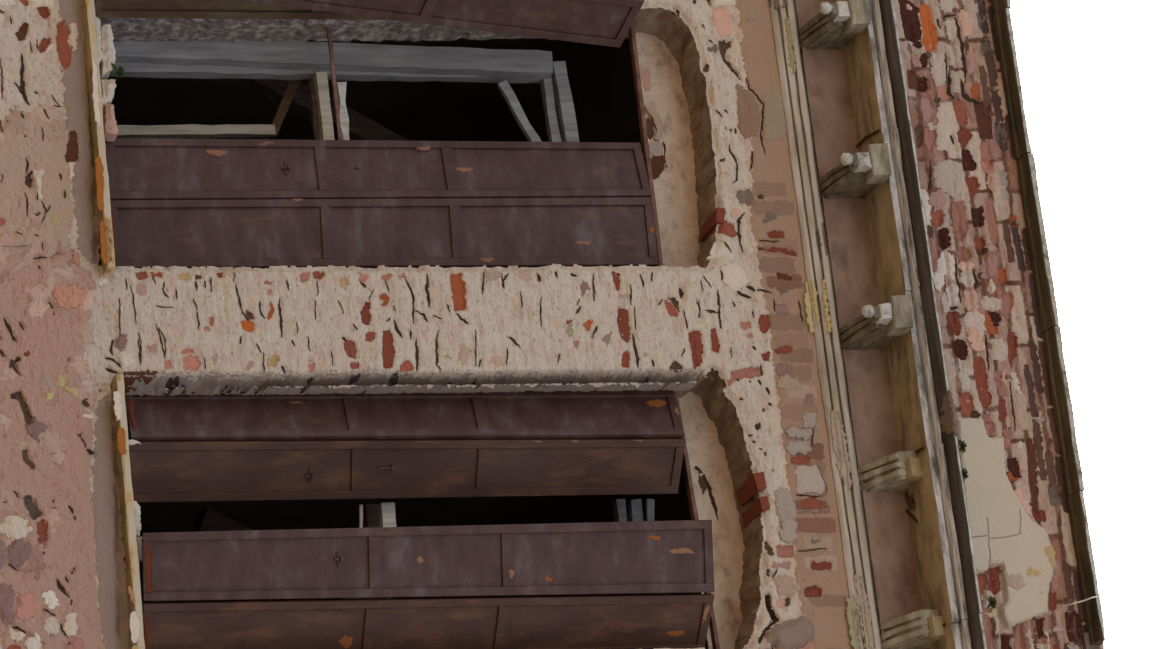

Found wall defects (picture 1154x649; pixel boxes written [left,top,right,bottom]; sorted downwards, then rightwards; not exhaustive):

flaking render [699,207,737,242]
flaking render [758,230,796,256]
flaking render [740,314,771,338]
flaking render [726,345,793,386]
flaking render [790,456,809,465]
flaking render [736,472,771,527]
flaking render [798,497,829,514]
flaking render [776,544,794,558]
flaking render [811,561,832,570]
flaking render [804,585,822,597]